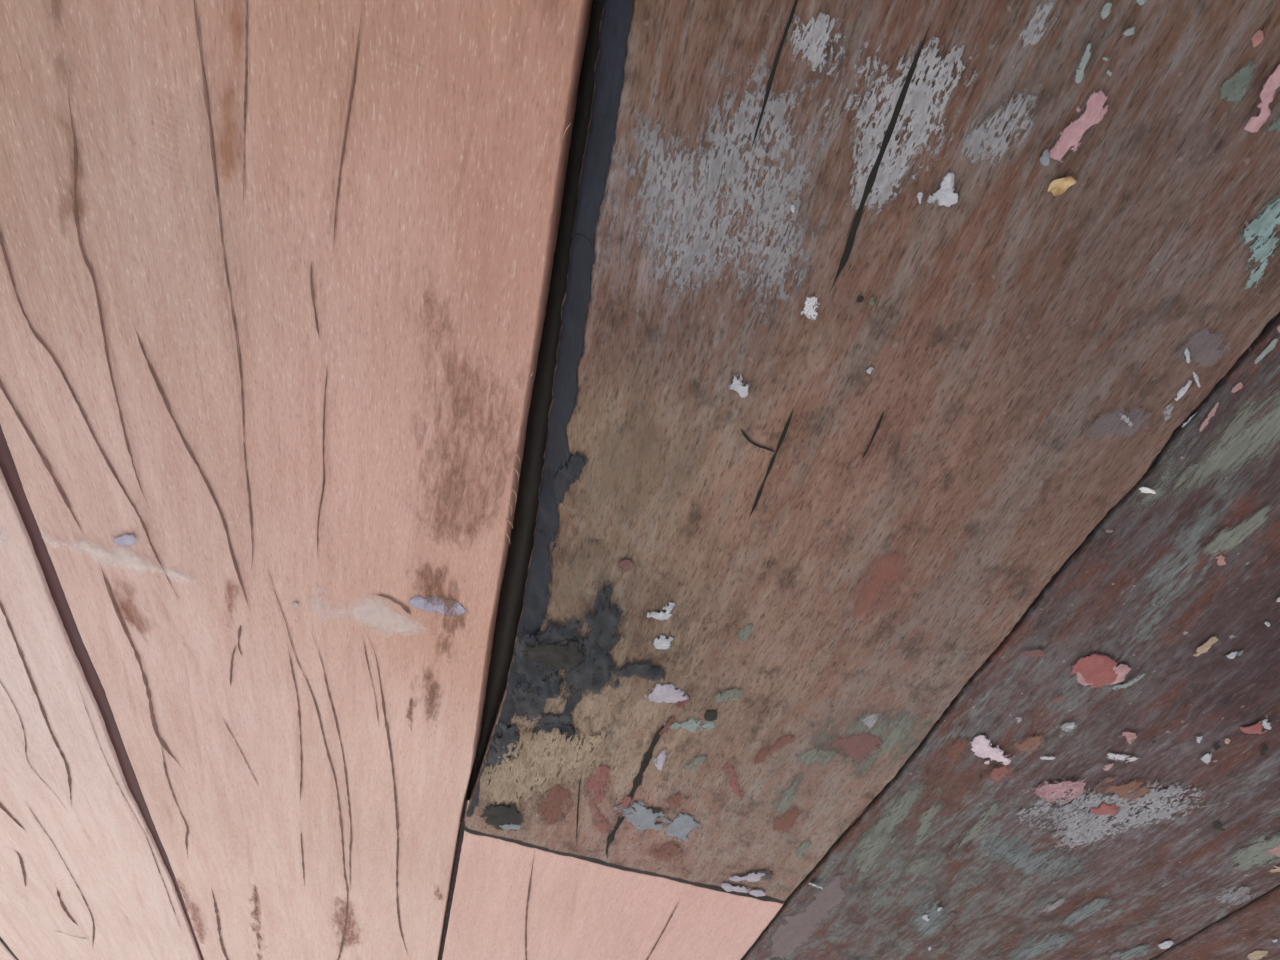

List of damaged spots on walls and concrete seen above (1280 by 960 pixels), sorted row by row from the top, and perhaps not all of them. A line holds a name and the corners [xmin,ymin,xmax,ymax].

crack [334,10,362,238]
crack [829,22,932,293]
peeling [917,172,958,207]
peeling [1040,90,1108,196]
peeling [1242,199,1280,290]
crack [0,0,352,960]
water stain [435,362,498,533]
water stain [466,0,634,817]
peeling [1070,654,1145,690]
crack [361,630,409,956]
peeling [948,722,1209,851]
crack [525,852,535,960]